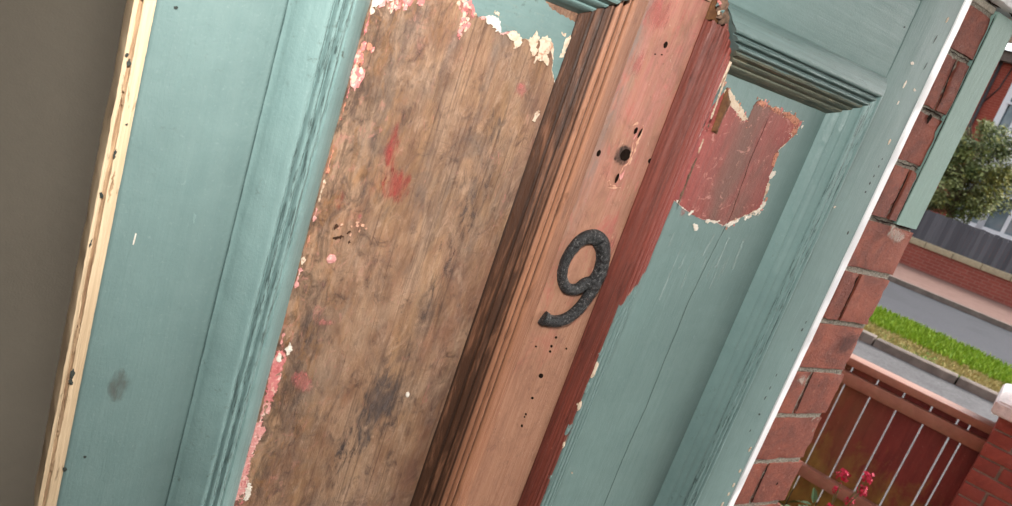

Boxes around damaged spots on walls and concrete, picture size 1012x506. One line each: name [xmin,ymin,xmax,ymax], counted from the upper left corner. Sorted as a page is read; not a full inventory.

peeling [340,0,425,121]
peeling [456,0,575,83]
peeling [313,146,334,222]
peeling [674,68,804,231]
peeling [294,235,310,288]
peeling [236,333,292,505]